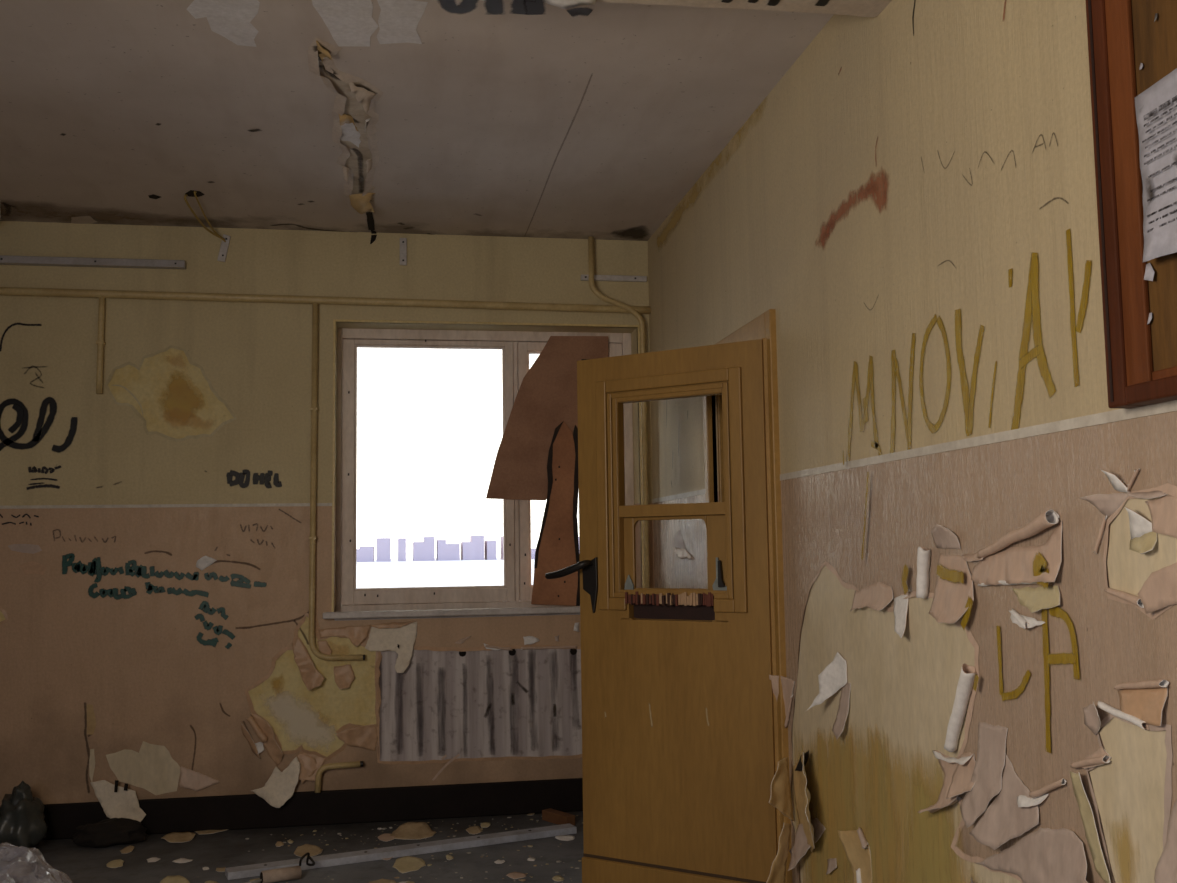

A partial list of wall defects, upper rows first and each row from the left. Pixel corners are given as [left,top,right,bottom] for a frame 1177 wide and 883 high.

peeling [187,0,260,47]
peeling [308,0,892,214]
crack [366,212,375,230]
peeling [1079,468,1177,620]
peeling [90,741,219,822]
peeling [245,612,417,808]
peeling [767,509,1177,883]